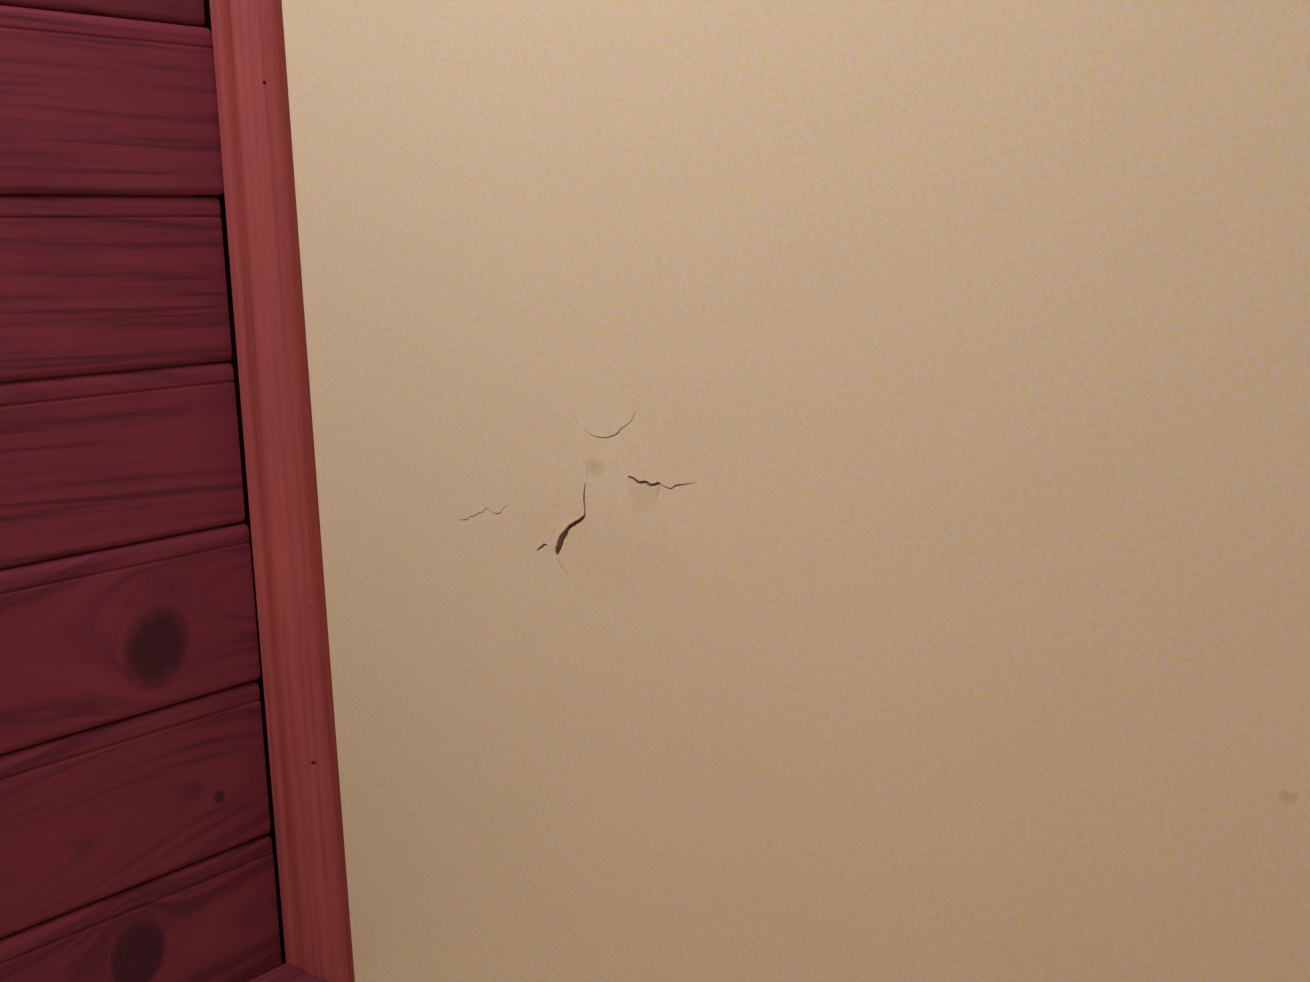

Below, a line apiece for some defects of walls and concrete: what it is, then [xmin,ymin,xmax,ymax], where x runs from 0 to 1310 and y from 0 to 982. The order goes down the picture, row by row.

crack [538,483,586,554]
crack [626,476,696,514]